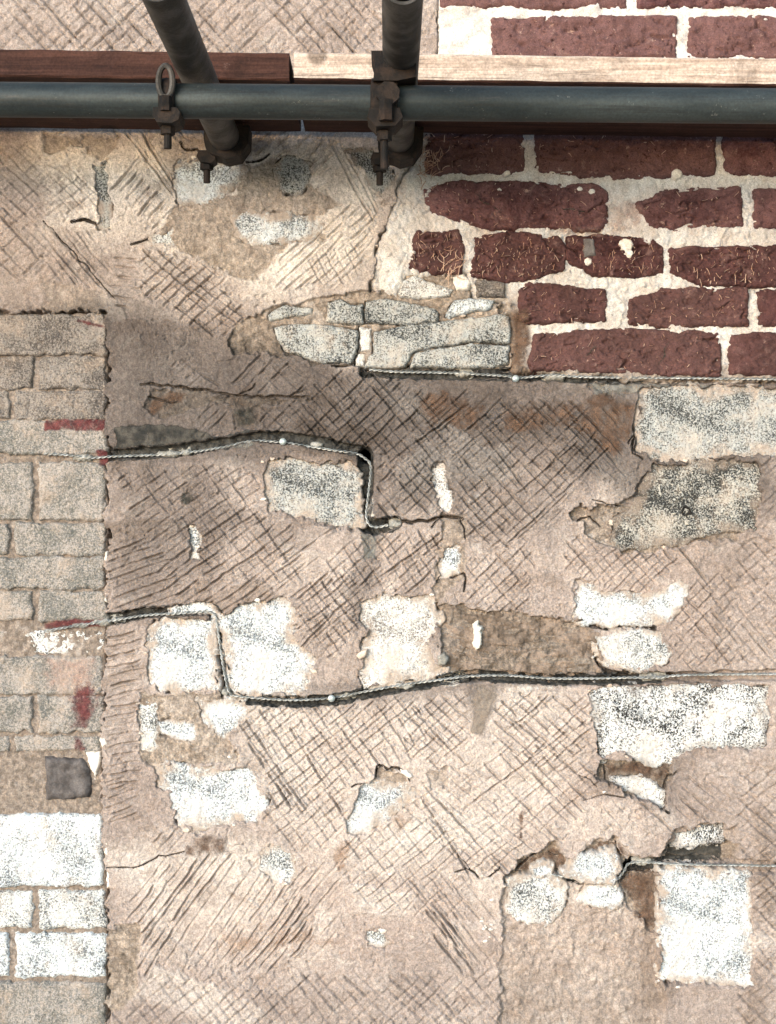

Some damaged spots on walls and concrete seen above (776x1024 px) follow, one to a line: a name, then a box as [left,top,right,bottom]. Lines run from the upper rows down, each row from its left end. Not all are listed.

spalling [172,156,250,208]
spalling [268,274,511,371]
spalling [260,456,370,530]
crack [386,515,466,539]
spalling [608,381,776,552]
spalling [136,596,317,834]
spalling [358,592,450,691]
crack [594,657,676,676]
spalling [570,579,771,809]
crack [455,852,558,877]
spalling [489,843,624,928]
spalling [650,823,755,989]